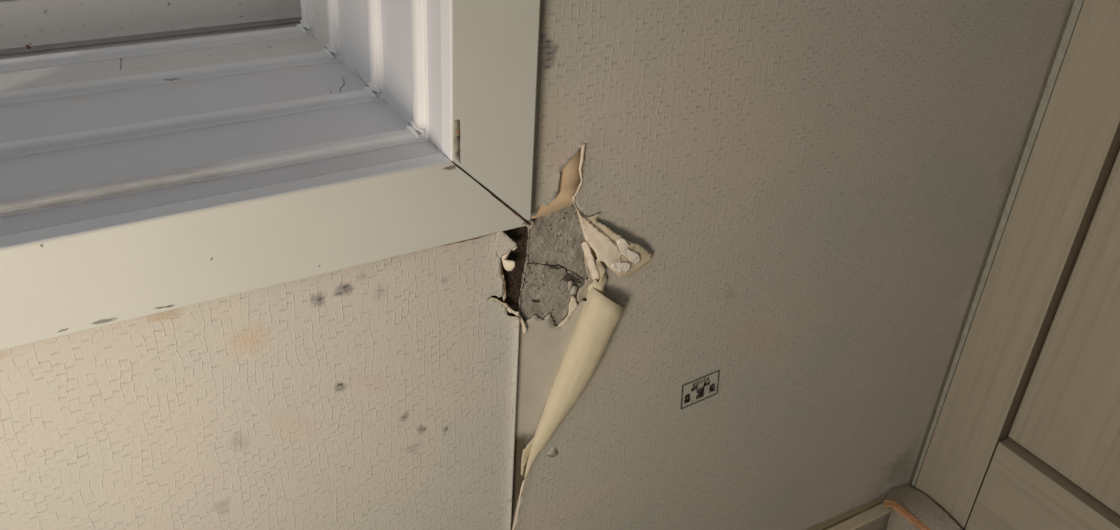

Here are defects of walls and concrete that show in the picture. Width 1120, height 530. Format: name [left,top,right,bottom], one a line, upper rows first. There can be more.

spalling [518,203,597,326]
peeling [612,238,640,273]